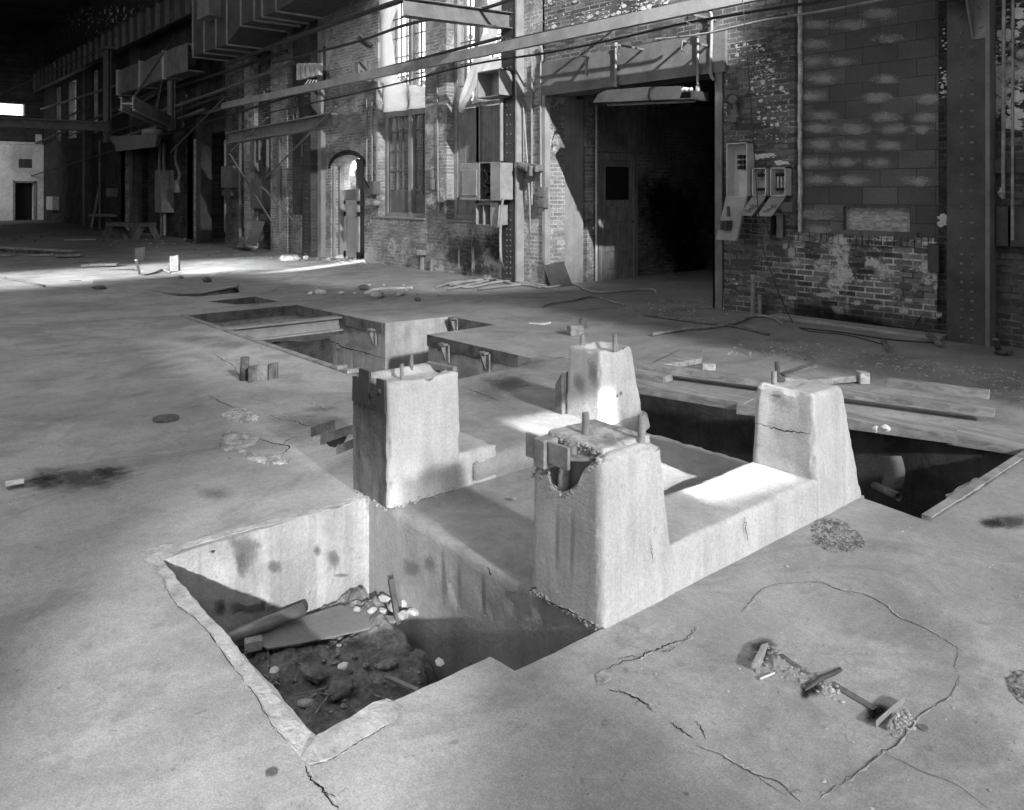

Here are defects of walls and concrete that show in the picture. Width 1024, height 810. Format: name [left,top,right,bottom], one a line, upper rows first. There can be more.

spalling [218,408,290,465]
crack [756,423,811,435]
damp [27,476,54,486]
damp [97,468,124,476]
damp [233,541,254,574]
crack [609,581,988,808]
crack [305,713,402,810]